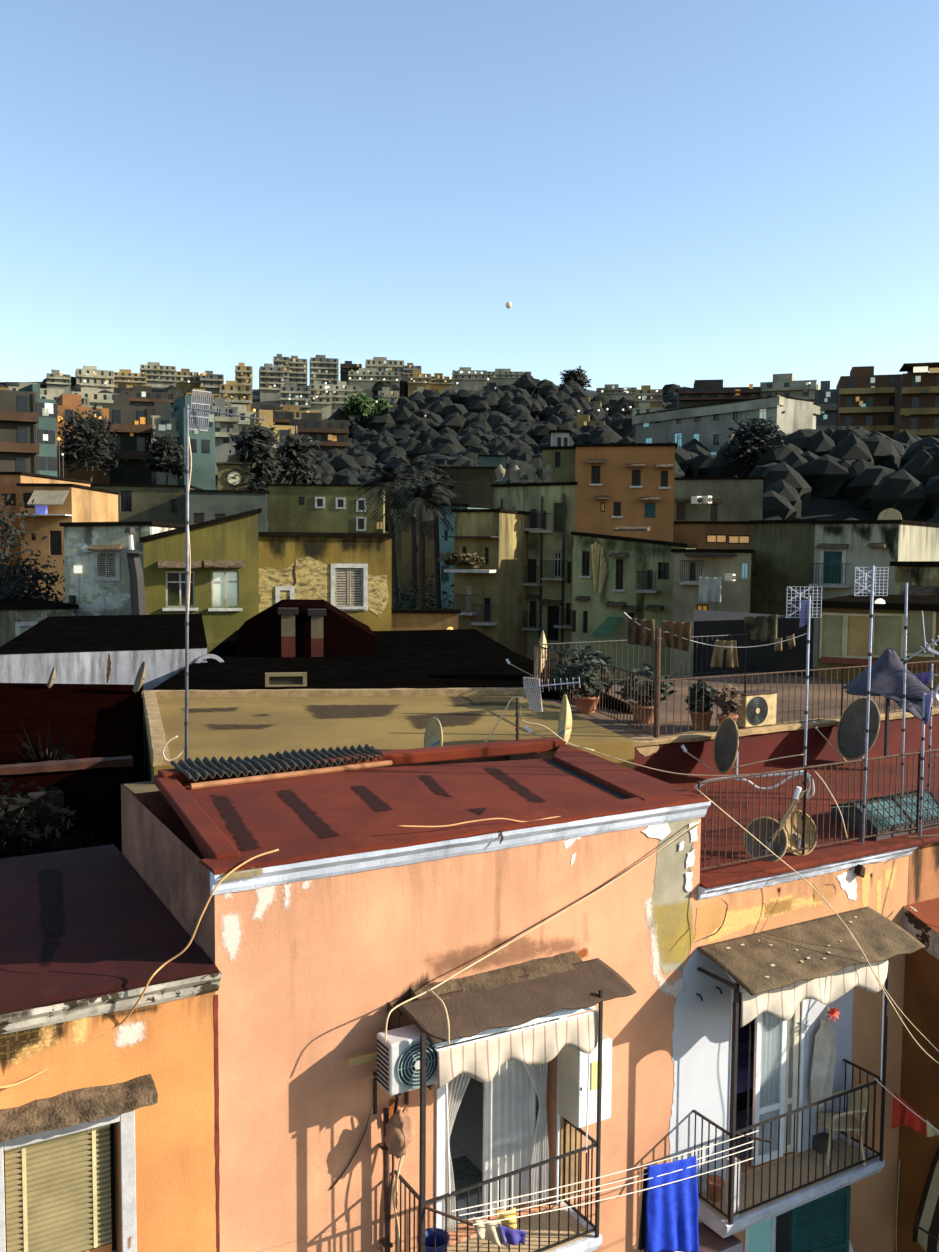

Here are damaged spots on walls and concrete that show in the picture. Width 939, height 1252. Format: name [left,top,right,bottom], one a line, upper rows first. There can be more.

peeling [220,880,312,961]
peeling [642,818,699,998]
water stain [915,844,939,902]
water stain [0,999,89,1070]
water stain [103,1005,157,1018]